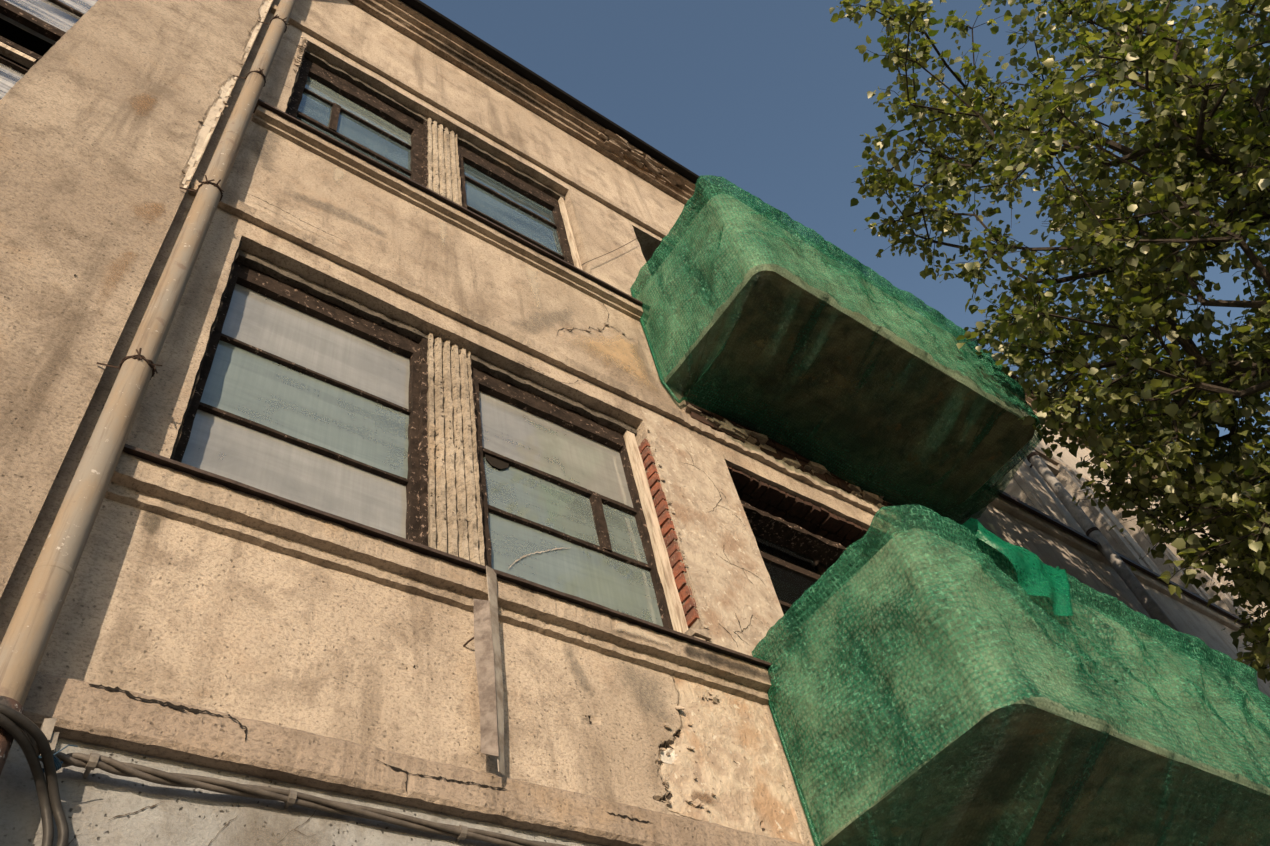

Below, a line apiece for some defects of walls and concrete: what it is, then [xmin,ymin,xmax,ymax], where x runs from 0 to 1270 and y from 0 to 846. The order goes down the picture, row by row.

flaking render [182,0,272,188]
crack [89,684,248,741]
crack [377,760,512,792]
flaking render [658,676,802,844]